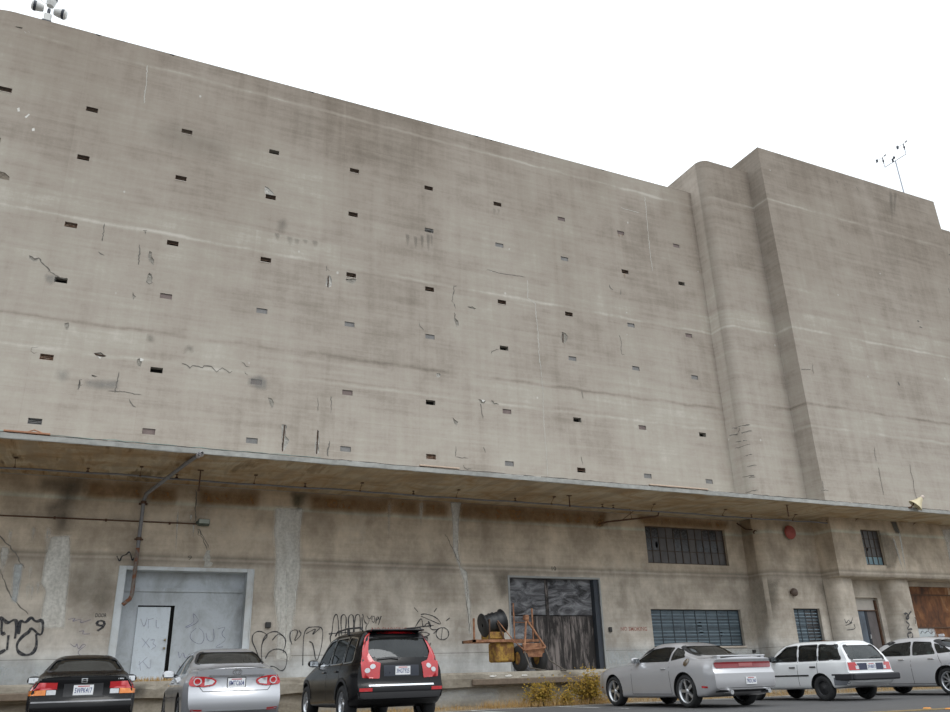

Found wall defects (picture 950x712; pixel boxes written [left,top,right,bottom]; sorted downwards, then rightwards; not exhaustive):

crack [182,362,248,374]
crack [0,536,28,614]